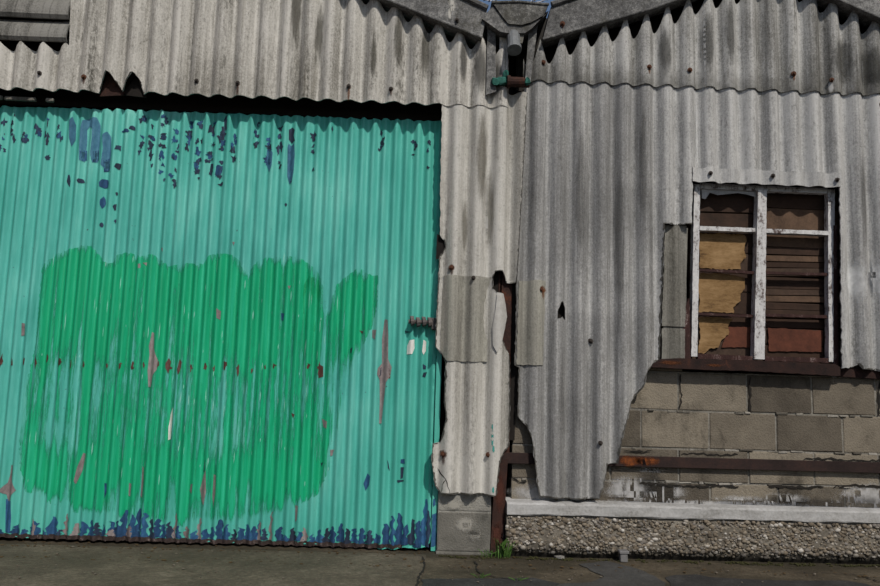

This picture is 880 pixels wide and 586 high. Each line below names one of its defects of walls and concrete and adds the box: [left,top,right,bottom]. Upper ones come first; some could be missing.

peeling [253,122,295,184]
peeling [0,234,504,548]
corrosion [496,477,504,509]